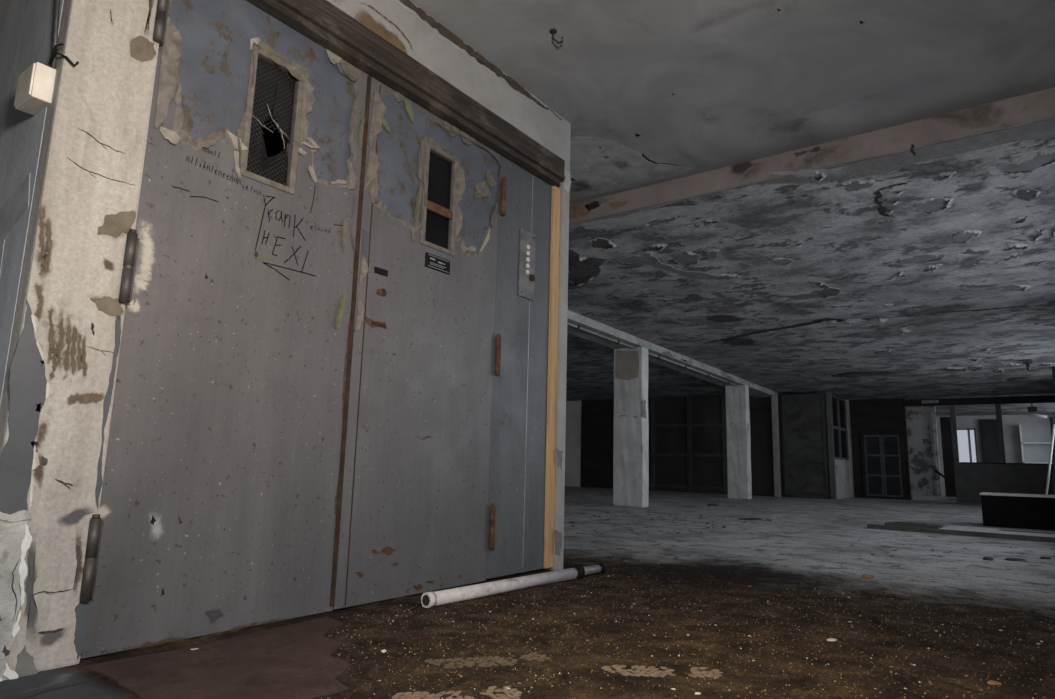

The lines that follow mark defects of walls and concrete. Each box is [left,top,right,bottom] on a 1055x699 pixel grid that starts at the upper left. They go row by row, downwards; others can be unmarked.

peeling [154,0,502,257]
peeling [563,134,740,280]
peeling [840,179,877,192]
peeling [914,198,954,214]
peeling [991,147,1055,174]
peeling [1010,188,1041,202]
peeling [998,215,1055,261]
peeling [335,254,369,330]
peeling [615,333,658,380]
peeling [95,315,121,508]
peeling [0,299,52,681]
peeling [74,601,90,659]